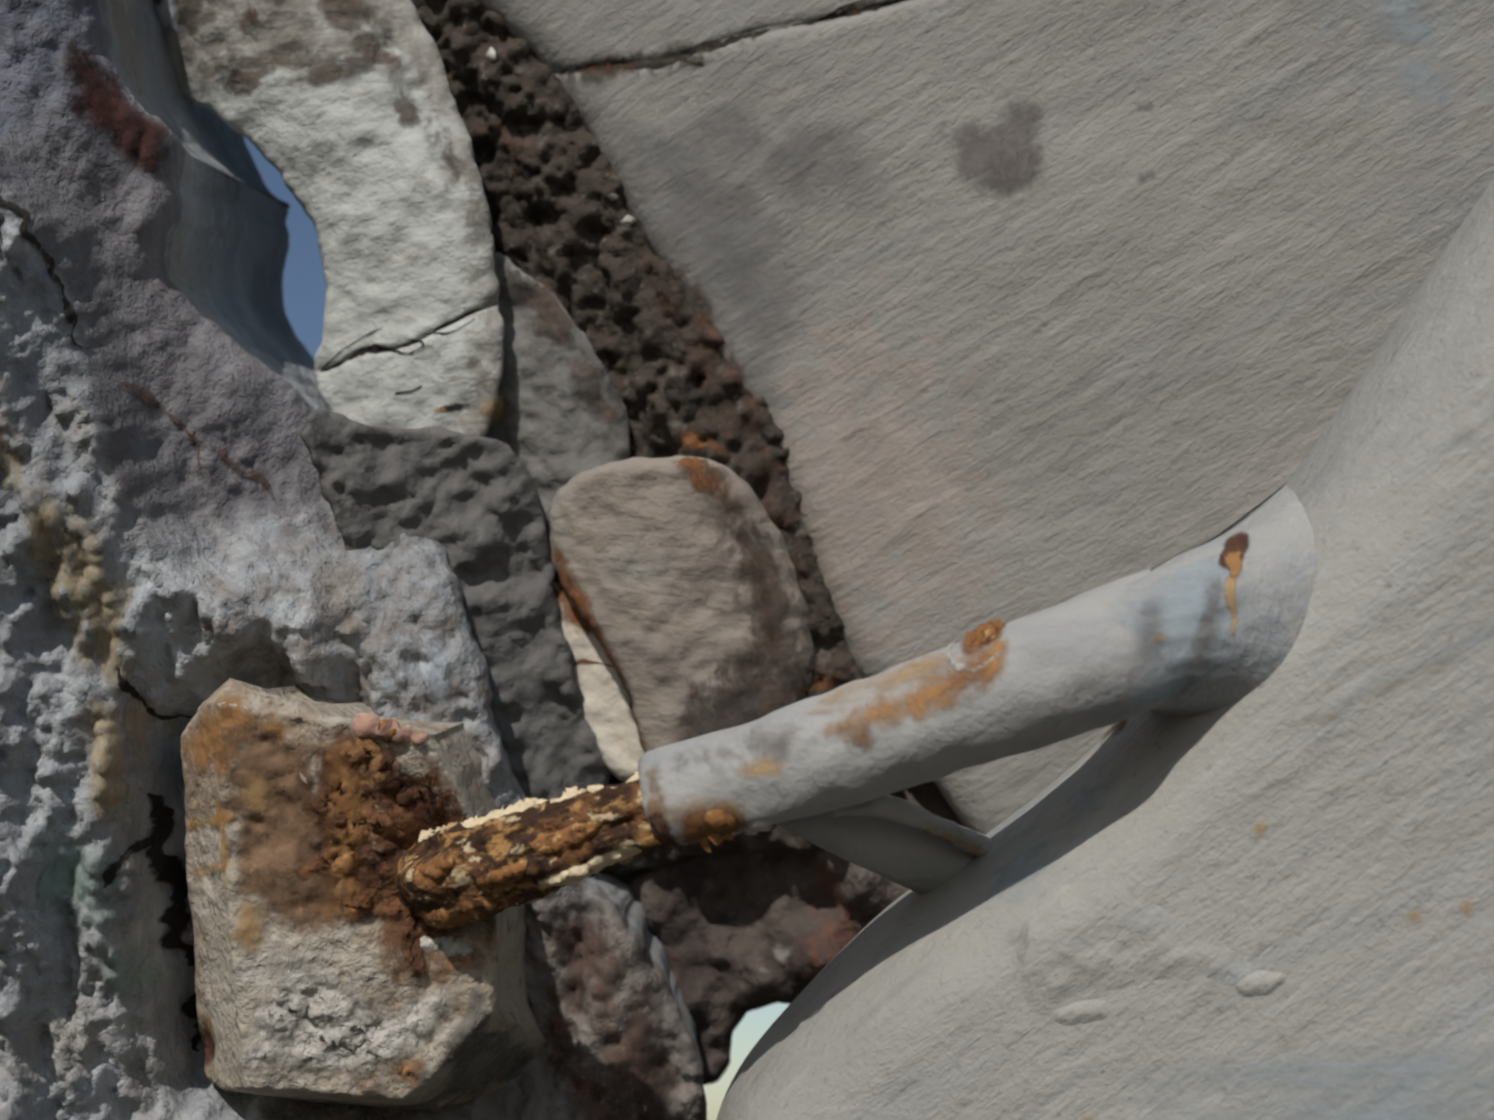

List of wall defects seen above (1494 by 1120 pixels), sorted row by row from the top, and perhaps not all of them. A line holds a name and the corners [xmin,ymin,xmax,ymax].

crack [560,0,901,74]
rust [67,40,167,171]
leakage [957,107,1037,191]
crack [0,196,83,349]
crack [320,304,496,395]
rust [657,288,761,497]
crack [116,668,193,720]
rust [552,550,641,742]
rust [834,618,1006,746]
rust [1219,532,1248,629]
rust [181,696,772,978]
crack [102,793,201,1051]